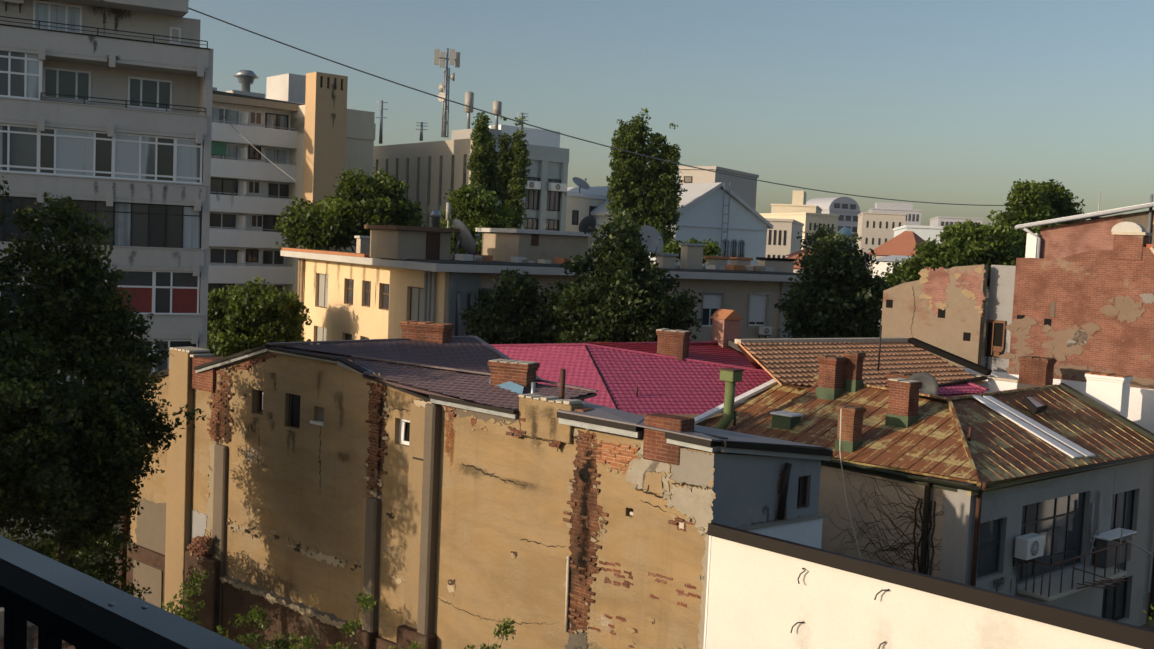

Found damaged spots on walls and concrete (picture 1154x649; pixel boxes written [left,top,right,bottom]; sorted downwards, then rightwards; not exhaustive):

flaking render [918,264,986,317]
peeling [1012,294,1154,373]
flaking render [364,372,390,499]
crack [462,463,527,486]
flaking render [549,428,717,649]